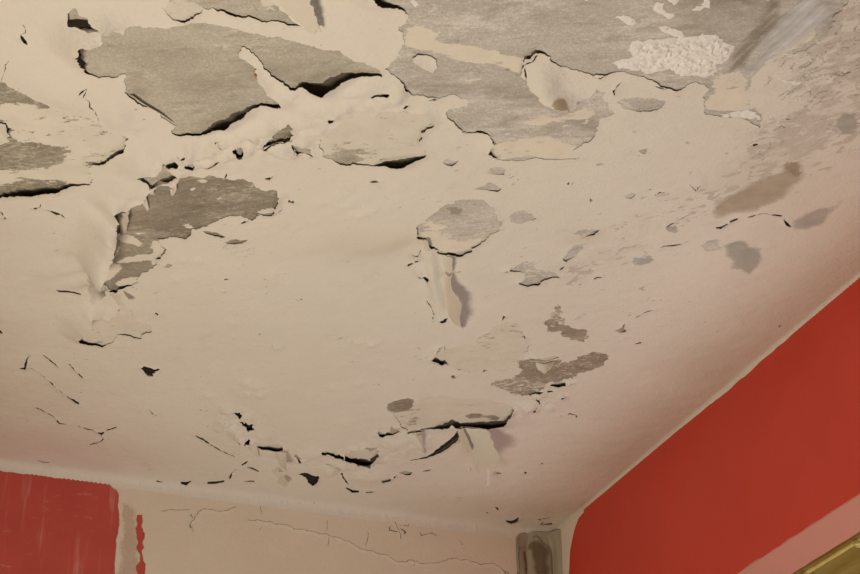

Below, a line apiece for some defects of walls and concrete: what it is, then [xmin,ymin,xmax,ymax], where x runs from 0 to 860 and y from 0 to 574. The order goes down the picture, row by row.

peeling [34,0,848,328]
peeling [0,82,278,349]
peeling [544,304,589,342]
peeling [323,322,608,485]
crack [152,434,262,533]
flaking render [224,413,325,487]
crack [337,471,378,494]
crack [404,430,461,473]
water stain [529,542,547,574]